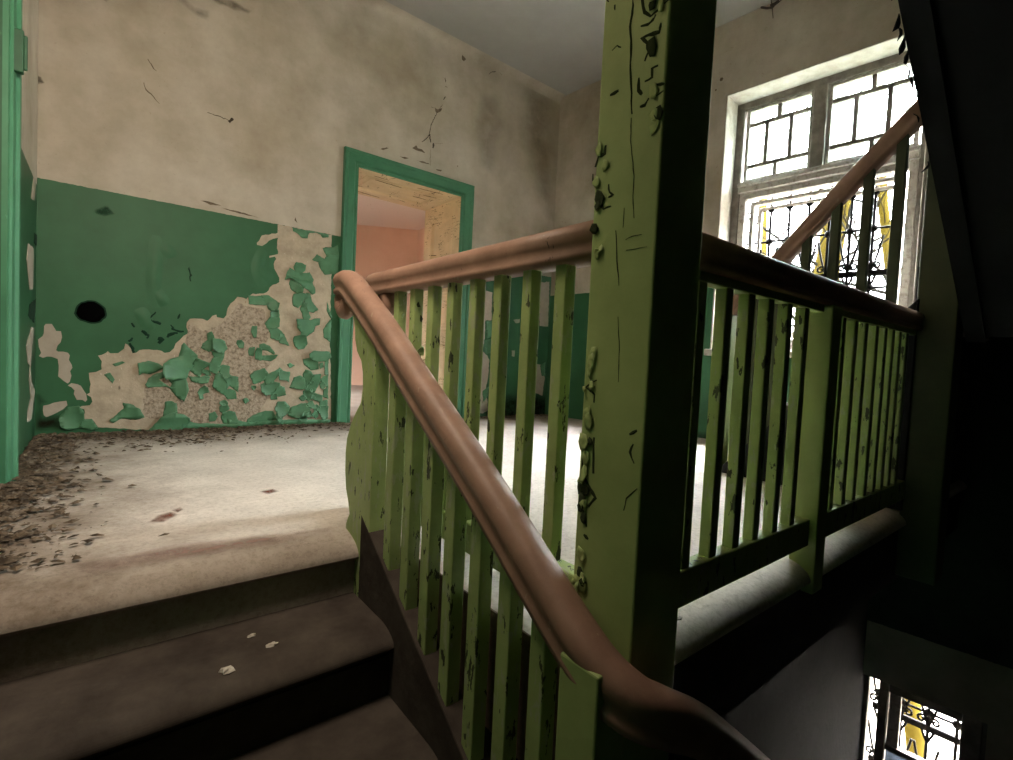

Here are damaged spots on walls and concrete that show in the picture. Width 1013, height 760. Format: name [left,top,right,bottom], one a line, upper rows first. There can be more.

peeling [647,36,657,57]
crack [413,79,446,158]
peeling [592,142,609,211]
peeling [26,217,339,431]